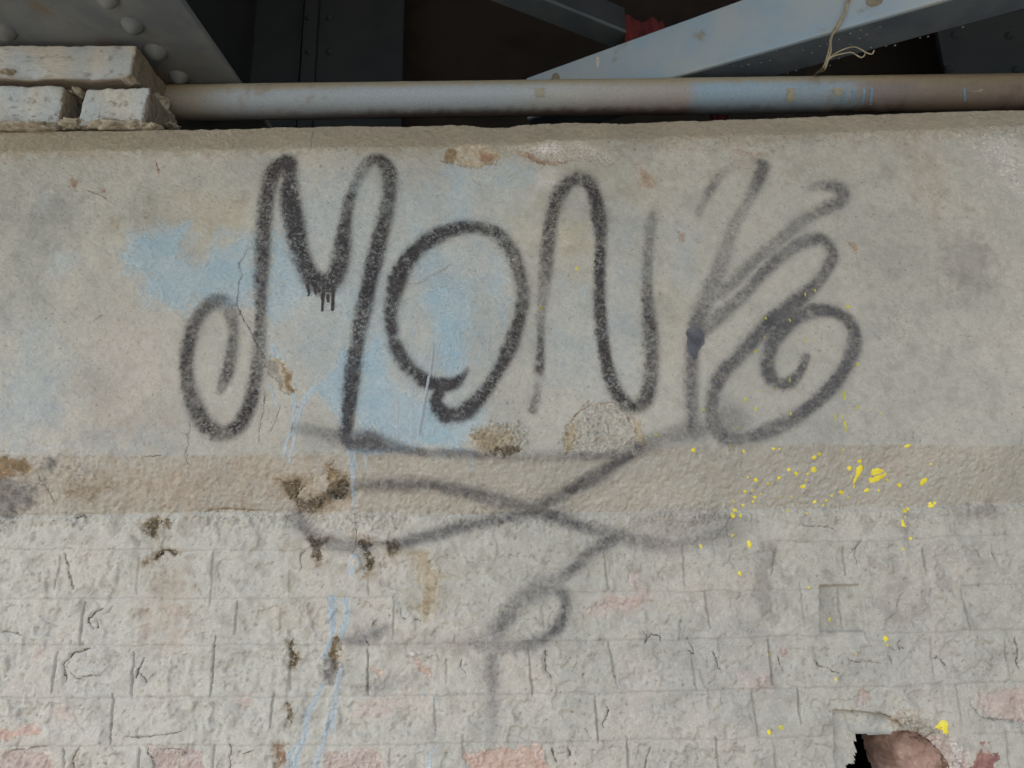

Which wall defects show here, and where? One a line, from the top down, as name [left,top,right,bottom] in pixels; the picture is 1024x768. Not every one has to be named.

spalling [442,145,579,169]
crack [235,250,266,358]
spalling [266,357,294,395]
spalling [846,719,1000,768]